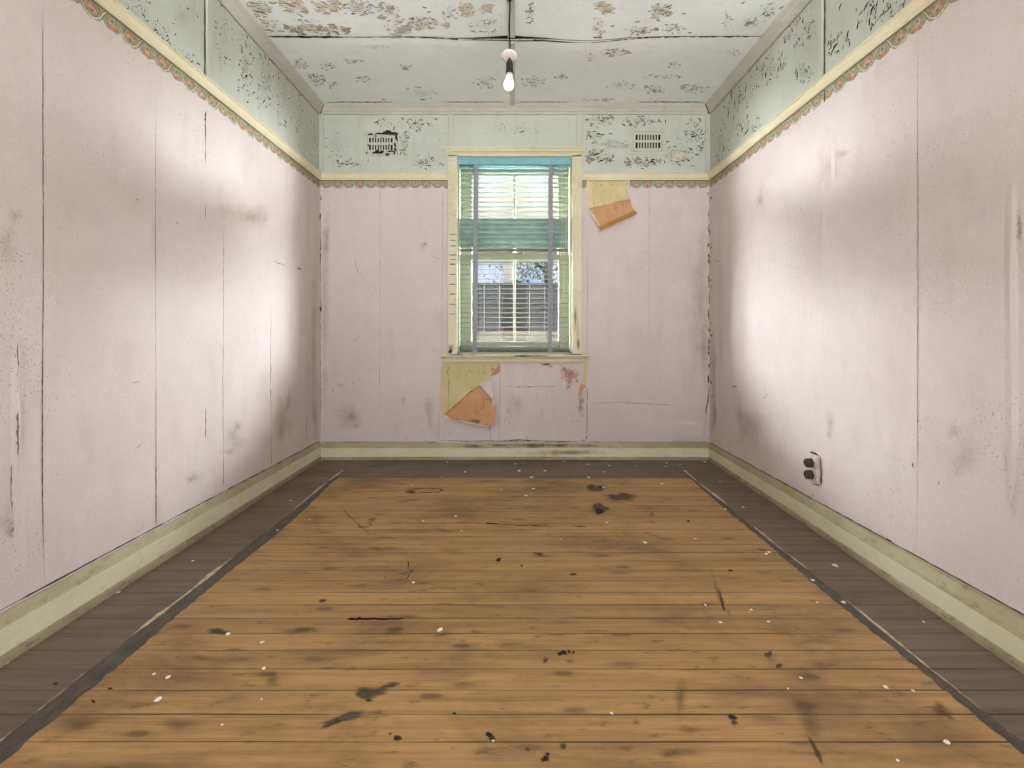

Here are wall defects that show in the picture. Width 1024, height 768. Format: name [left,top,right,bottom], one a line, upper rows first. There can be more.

peeling [245,0,502,49]
peeling [587,1,692,61]
peeling [721,2,784,27]
peeling [826,0,905,56]
peeling [215,4,444,171]
crack [10,361,44,539]